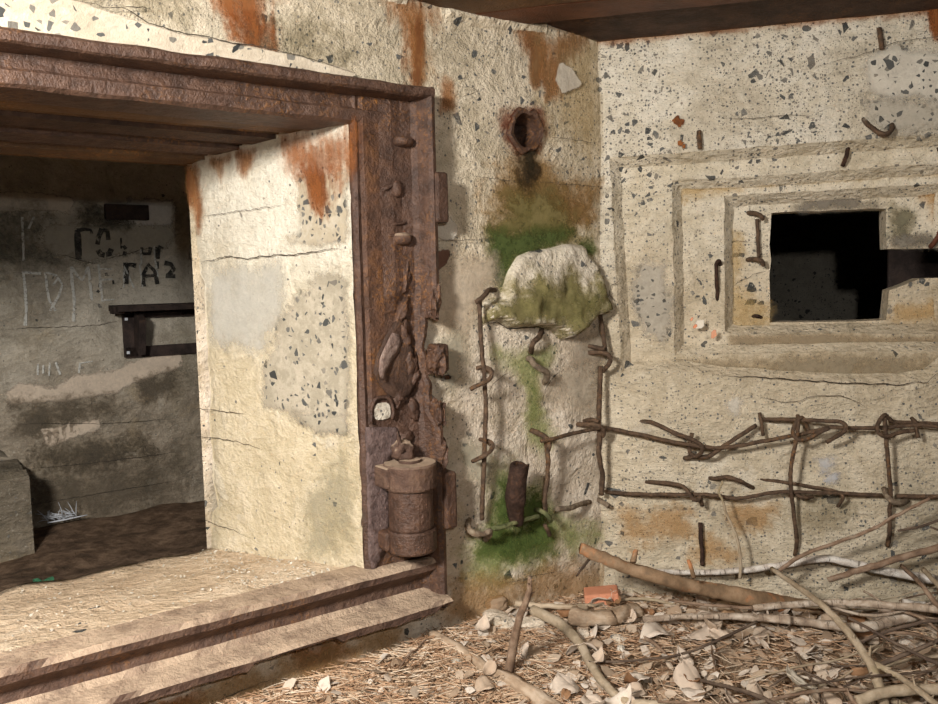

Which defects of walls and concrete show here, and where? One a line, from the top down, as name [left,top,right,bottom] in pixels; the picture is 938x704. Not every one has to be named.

rust [218,0,274,48]
rust [929,9,938,35]
rust [522,30,557,97]
rust [186,165,201,227]
rust [288,130,356,204]
water stain [496,150,598,225]
rust [393,261,420,444]
spalling [463,443,492,483]
water stain [524,493,543,522]